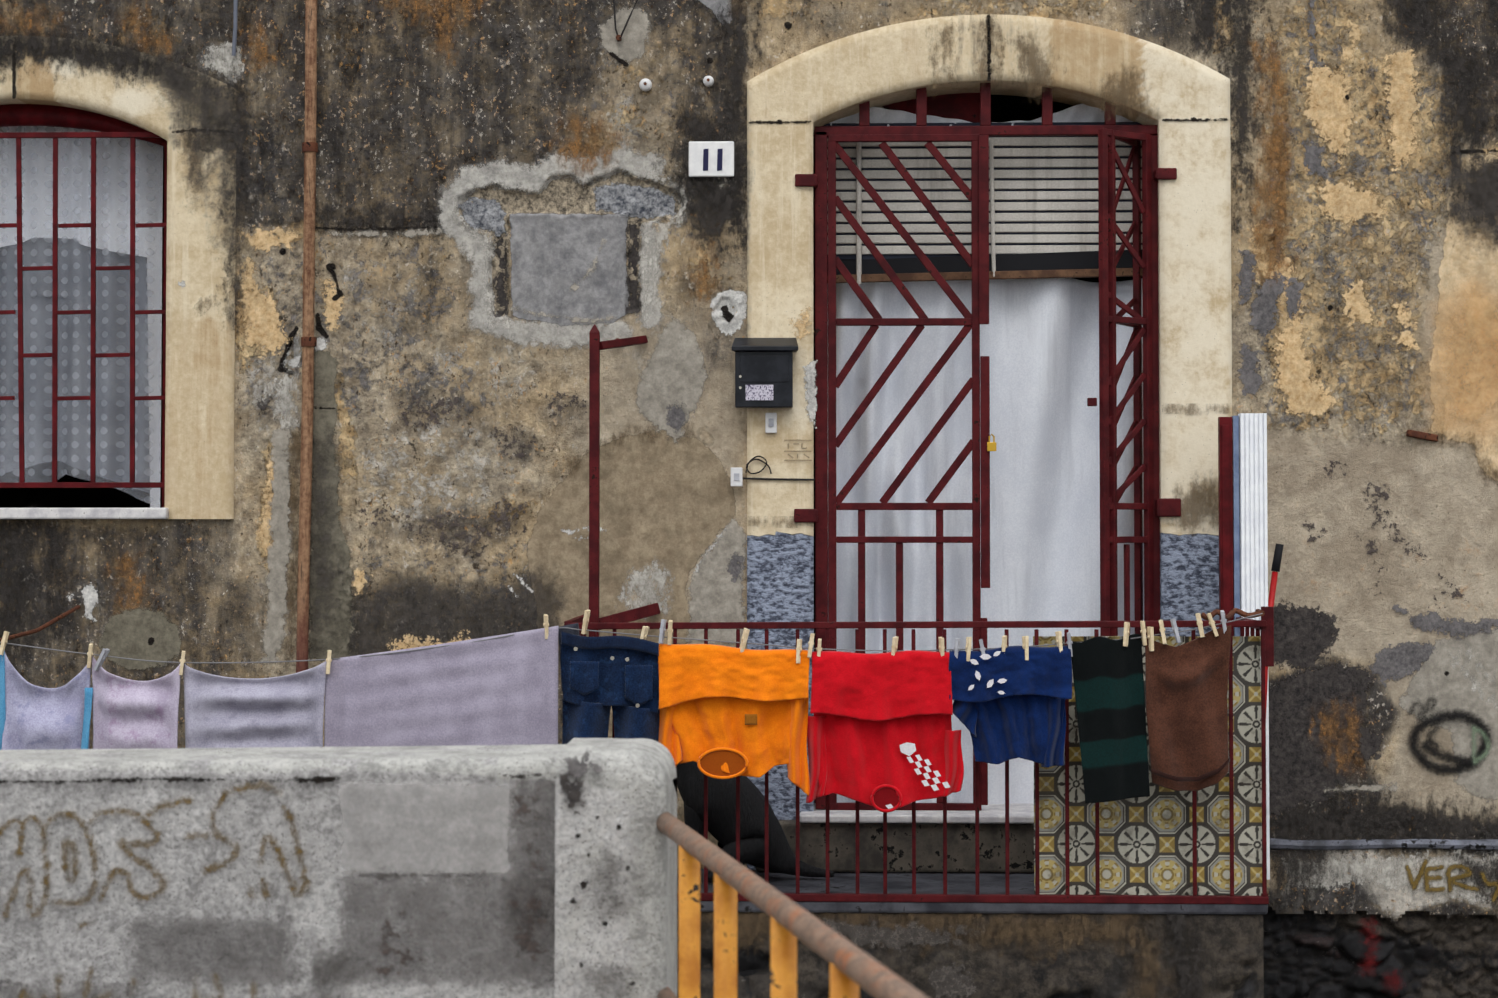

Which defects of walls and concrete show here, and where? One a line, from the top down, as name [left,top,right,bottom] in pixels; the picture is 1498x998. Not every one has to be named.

leakage [0,26,257,332]
leakage [315,201,444,247]
spalling [453,165,688,329]
peeling [1236,221,1339,422]
peeling [1301,0,1392,228]
peeling [1381,48,1424,171]
peeling [1342,154,1498,481]
leakage [1369,0,1498,243]
leakage [0,519,82,661]
leakage [255,427,301,663]